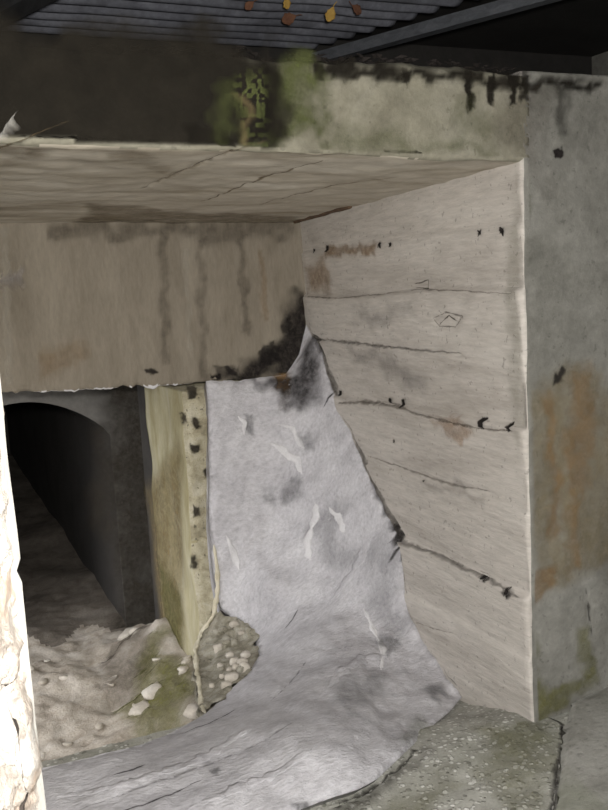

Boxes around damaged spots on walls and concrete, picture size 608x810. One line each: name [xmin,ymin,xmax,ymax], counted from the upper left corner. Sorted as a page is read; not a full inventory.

water stain [0,14,289,147]
water stain [314,58,601,111]
spalling [191,545,259,717]
crack [550,718,564,810]